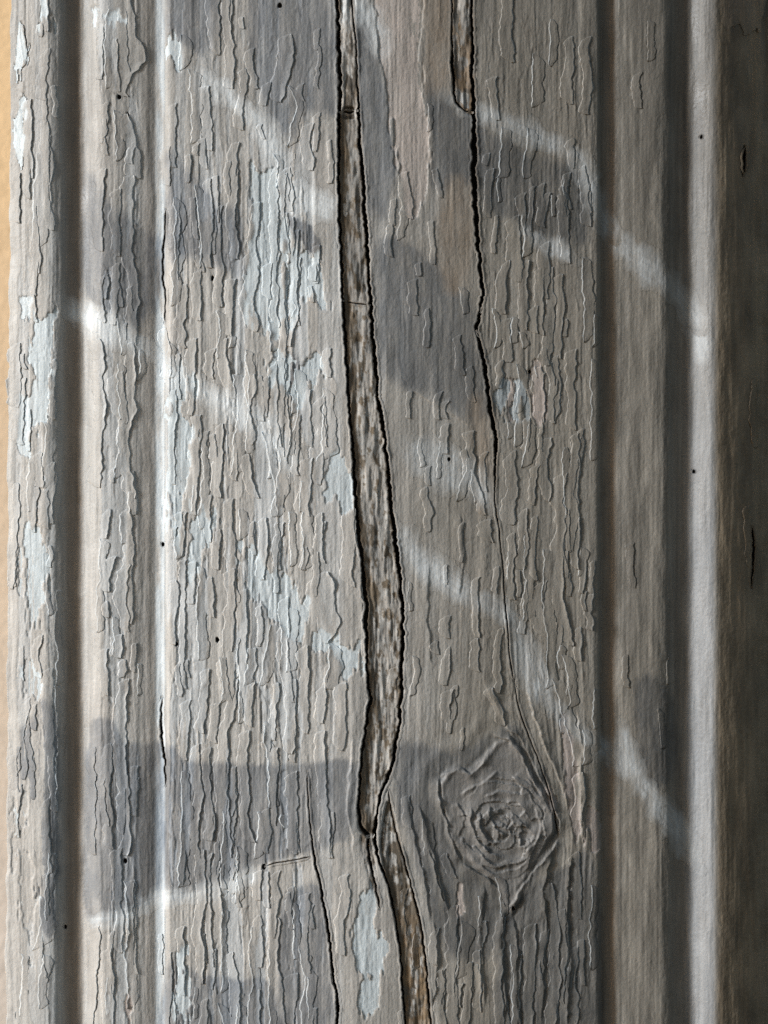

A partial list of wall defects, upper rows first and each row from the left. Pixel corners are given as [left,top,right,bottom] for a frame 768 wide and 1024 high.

peeling [5,0,66,1019]
peeling [84,0,147,1024]
peeling [157,0,364,1024]
crack [264,771,342,1024]
peeling [333,874,389,1020]
crack [333,0,435,1024]
peeling [387,667,398,688]
peeling [377,0,443,348]
peeling [398,76,603,1024]
crack [448,0,560,835]
peeling [531,19,594,115]